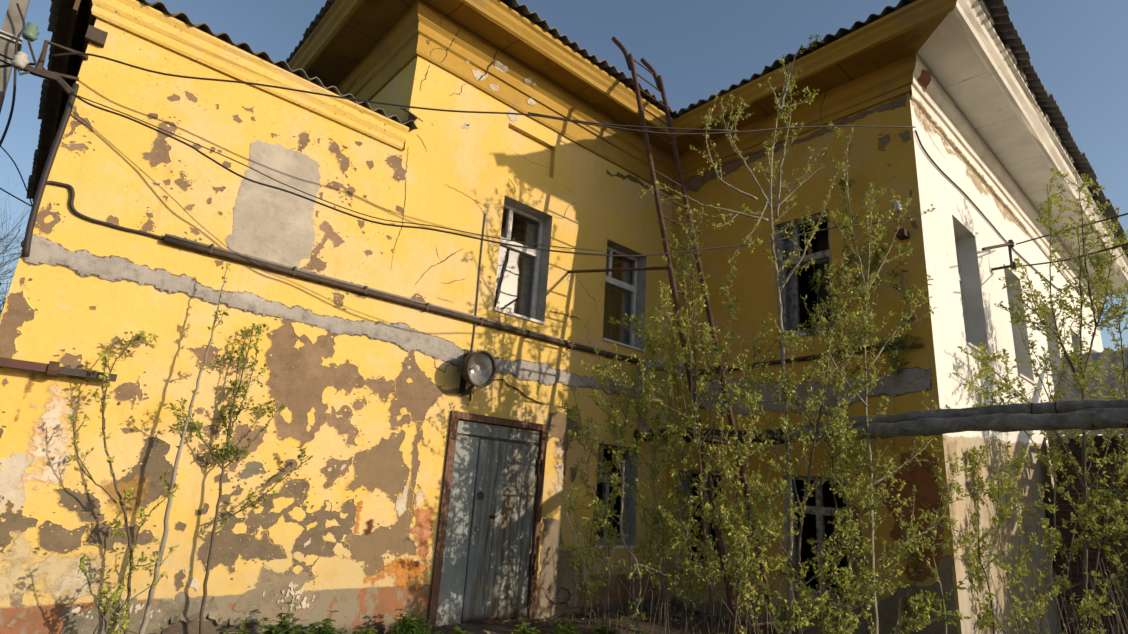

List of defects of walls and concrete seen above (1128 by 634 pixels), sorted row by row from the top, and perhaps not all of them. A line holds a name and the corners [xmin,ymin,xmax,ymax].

peeling [60,104,95,158]
peeling [167,91,199,103]
peeling [141,112,232,217]
crack [420,18,460,90]
spalling [684,69,1028,236]
peeling [34,202,66,235]
peeling [137,207,202,254]
peeling [271,131,408,310]
crack [415,248,463,302]
peeling [0,276,38,387]
peeling [0,318,480,634]
spalling [877,450,944,582]